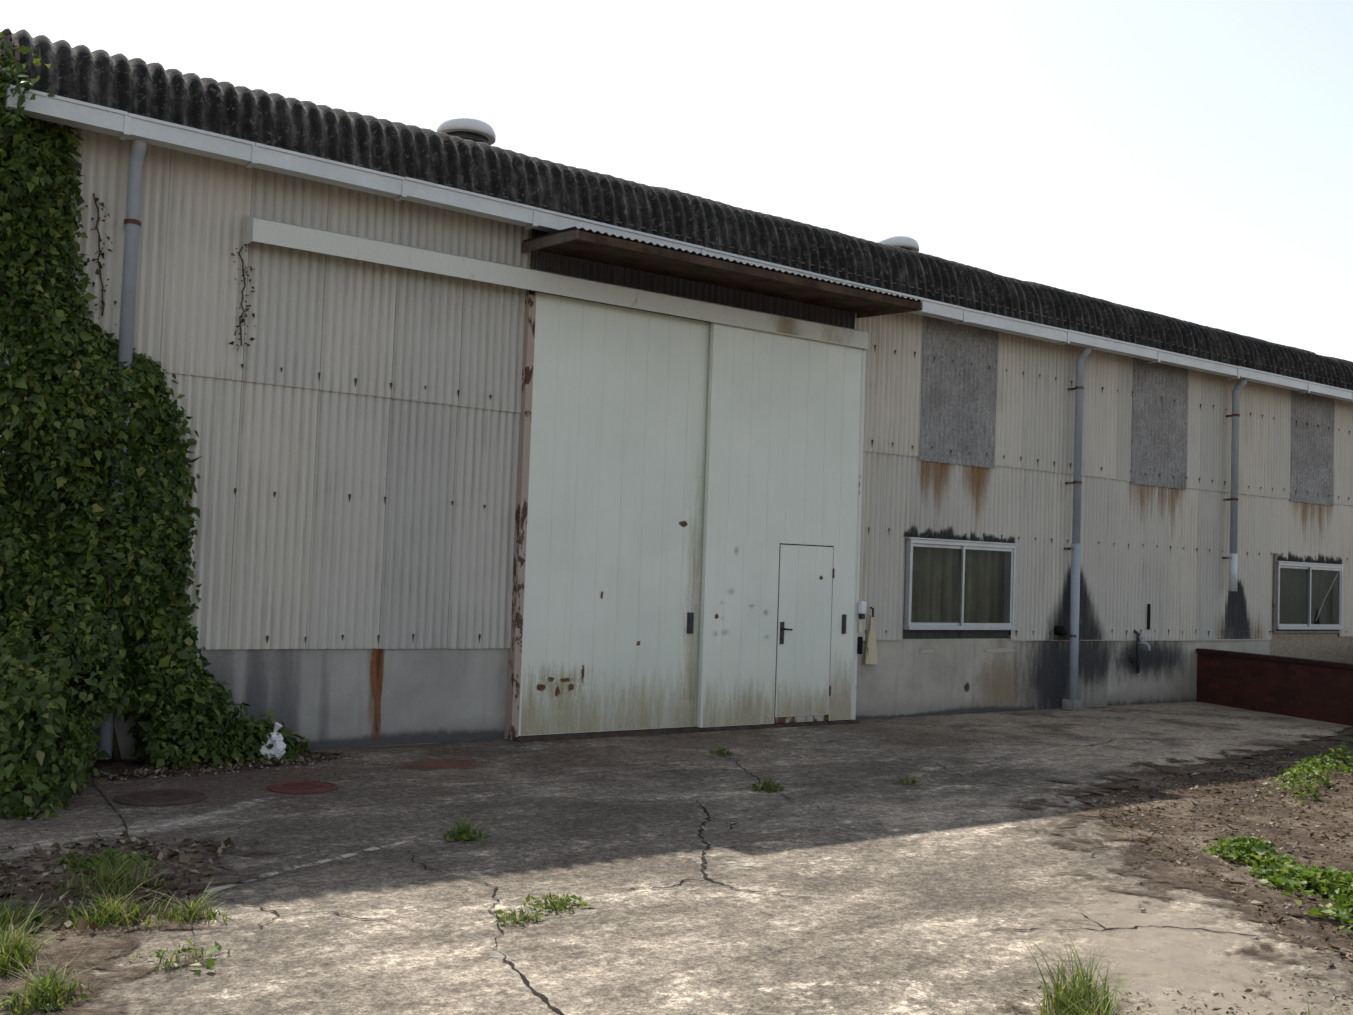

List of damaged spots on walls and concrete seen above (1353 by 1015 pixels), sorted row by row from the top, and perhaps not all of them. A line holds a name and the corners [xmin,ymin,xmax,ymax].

rust [912,445,952,492]
rust [969,452,1072,506]
mould [904,526,1015,543]
rust [371,635,384,738]
damp [1031,569,1180,710]
crack [404,848,565,1015]